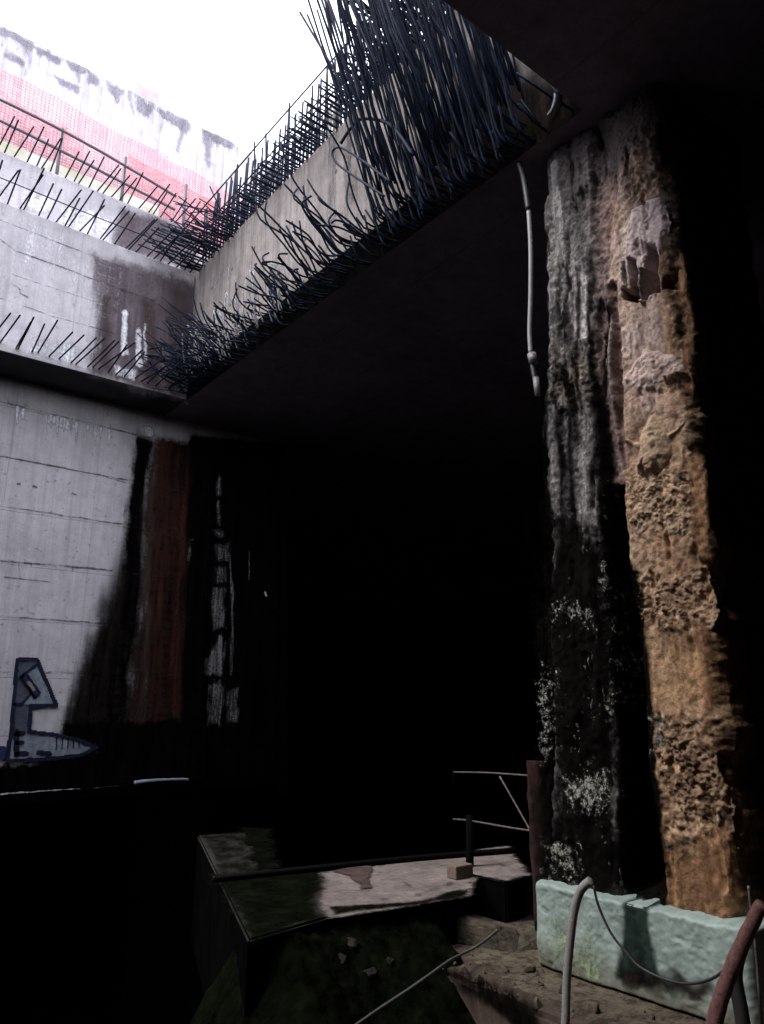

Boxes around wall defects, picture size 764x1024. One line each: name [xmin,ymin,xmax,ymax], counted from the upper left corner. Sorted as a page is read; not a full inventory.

spalling [0,0,536,394]
flaking render [619,195,672,306]
spalling [622,349,694,391]
leakage [0,426,291,797]
rust [128,438,192,725]
leakage [531,159,667,986]